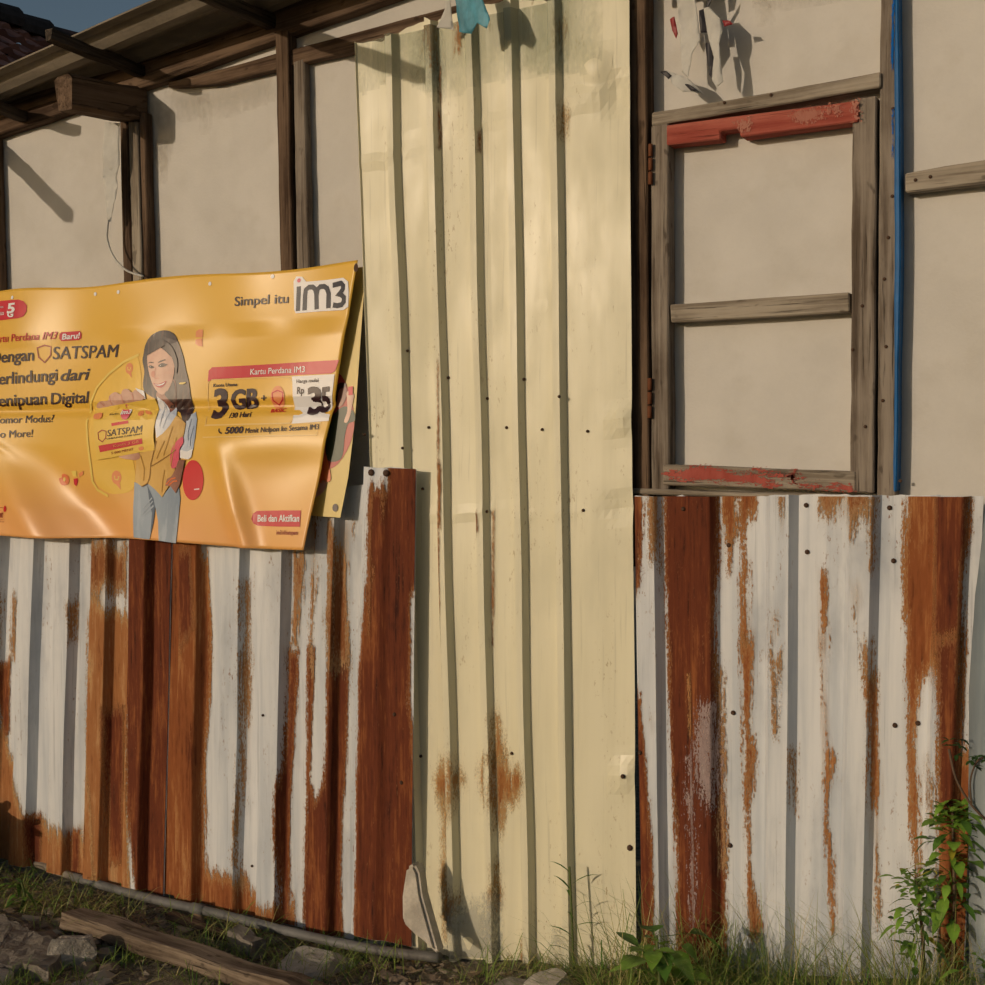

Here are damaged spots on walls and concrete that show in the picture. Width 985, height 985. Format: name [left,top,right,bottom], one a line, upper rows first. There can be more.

peeling [788,97,863,125]
peeling [661,464,856,494]
corrosion [817,496,880,577]
corrosion [0,468,416,947]
corrosion [435,758,464,937]
corrosion [480,714,523,835]
corrosion [635,496,764,973]
corrosion [767,607,783,743]
corrosion [818,566,831,718]
corrosion [821,730,838,935]
corrosion [853,600,883,818]
corrosion [900,496,975,982]